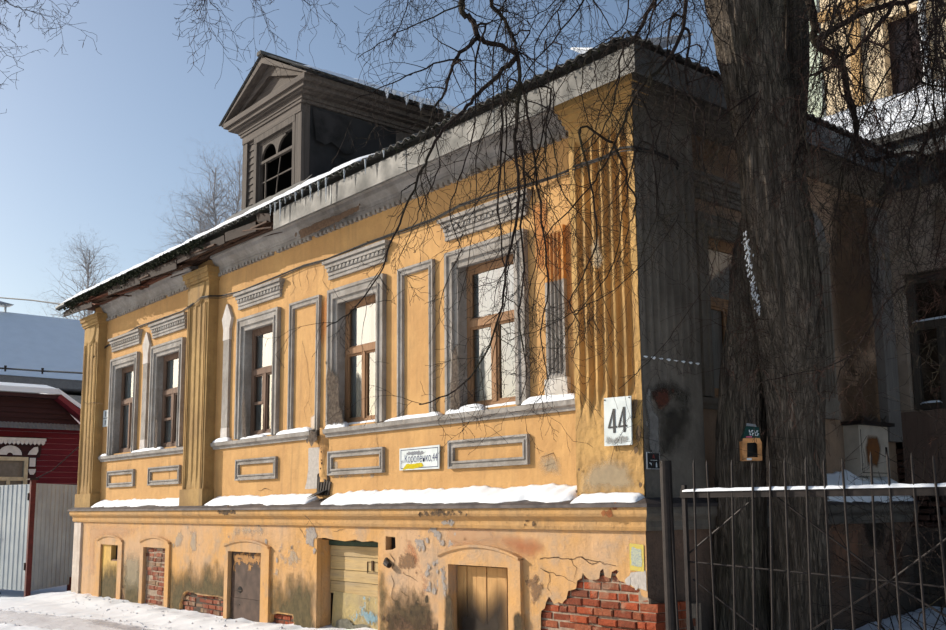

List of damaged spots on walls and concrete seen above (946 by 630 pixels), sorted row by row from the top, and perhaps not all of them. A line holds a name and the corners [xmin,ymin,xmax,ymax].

damp [645,385,688,453]
peeling [228,527,267,571]
peeling [398,509,467,603]
crack [540,556,615,591]
flaking render [182,592,223,616]
damp [272,582,314,628]
flaking render [525,569,666,630]